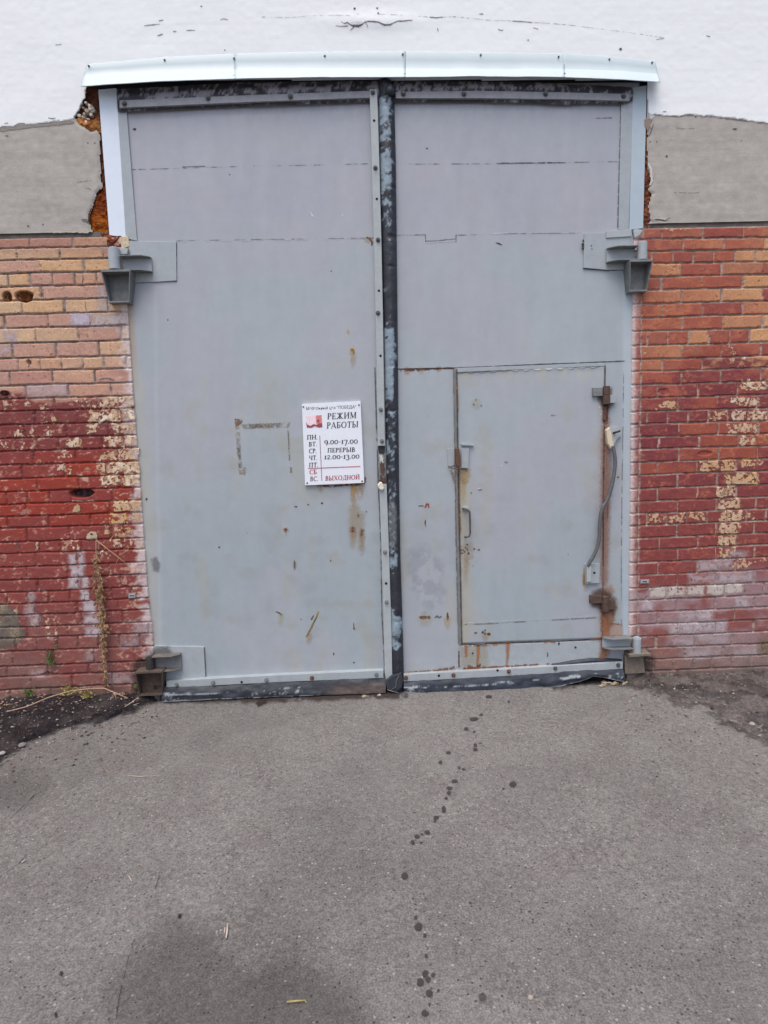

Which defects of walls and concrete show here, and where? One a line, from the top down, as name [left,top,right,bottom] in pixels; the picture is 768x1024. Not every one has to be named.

crack [341,14,463,30]
spalling [0,86,123,247]
spalling [643,111,767,231]
peeling [0,390,140,497]
peeling [90,498,147,562]
corrosion [583,388,623,659]
peeling [646,379,768,570]
corrosion [404,630,560,673]